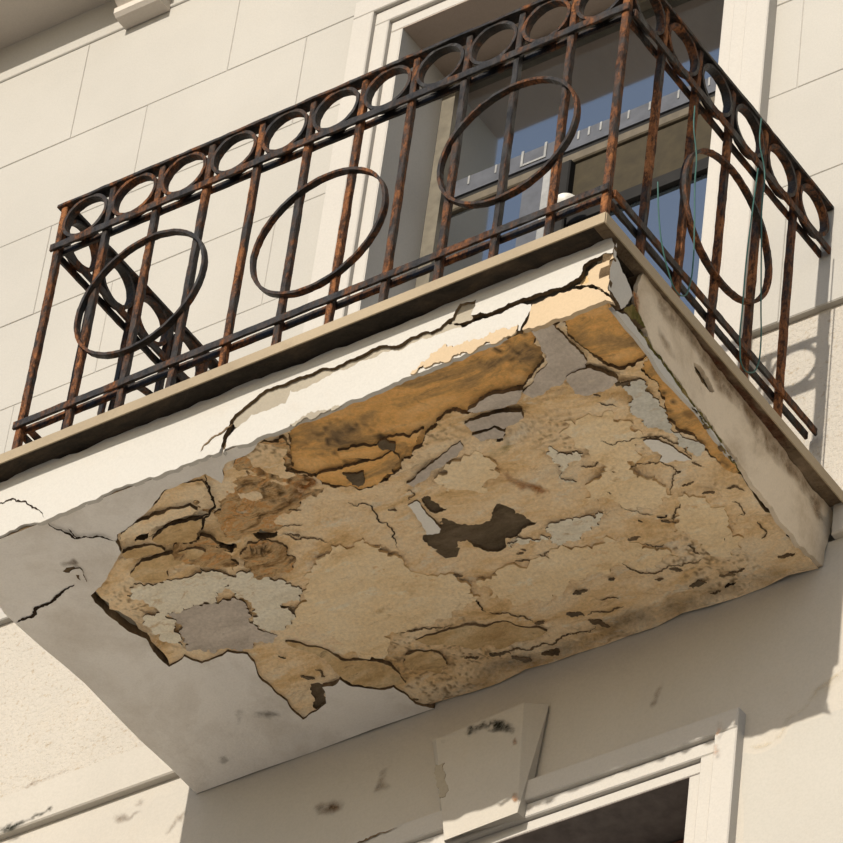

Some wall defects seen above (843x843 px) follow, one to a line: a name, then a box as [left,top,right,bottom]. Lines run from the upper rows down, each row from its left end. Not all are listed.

rust [700,344,786,444]
crack [201,424,232,450]
crack [0,498,113,541]
flaking render [96,295,819,717]
crack [18,585,74,622]